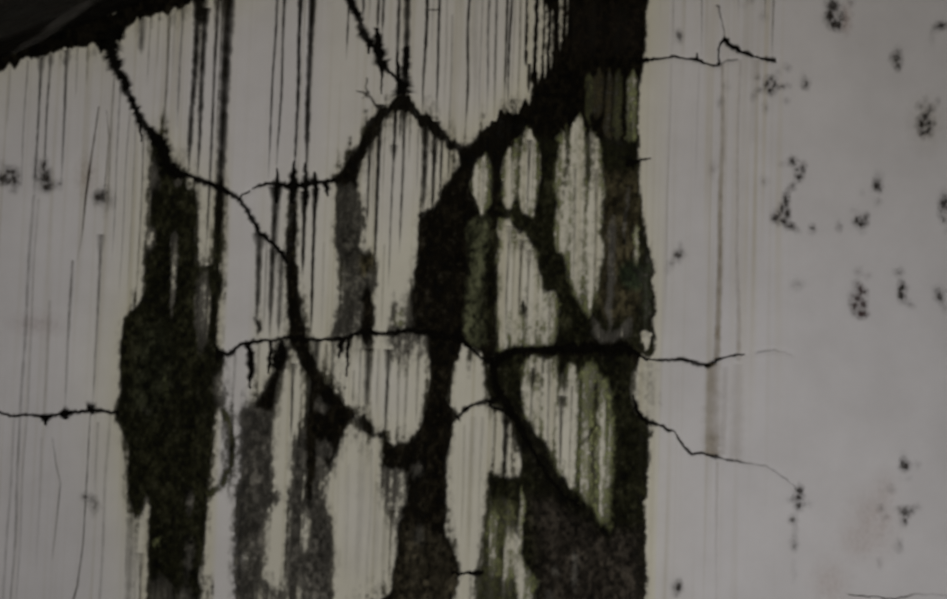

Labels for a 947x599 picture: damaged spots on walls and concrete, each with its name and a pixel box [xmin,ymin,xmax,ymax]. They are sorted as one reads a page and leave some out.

damp [826,0,843,29]
crack [346,0,412,108]
crack [628,19,776,67]
crack [96,30,337,264]
crack [626,158,651,166]
damp [772,159,805,228]
damp [0,0,657,599]
damp [853,287,866,317]
crack [0,404,119,425]
crack [215,327,745,509]
crack [451,569,484,577]